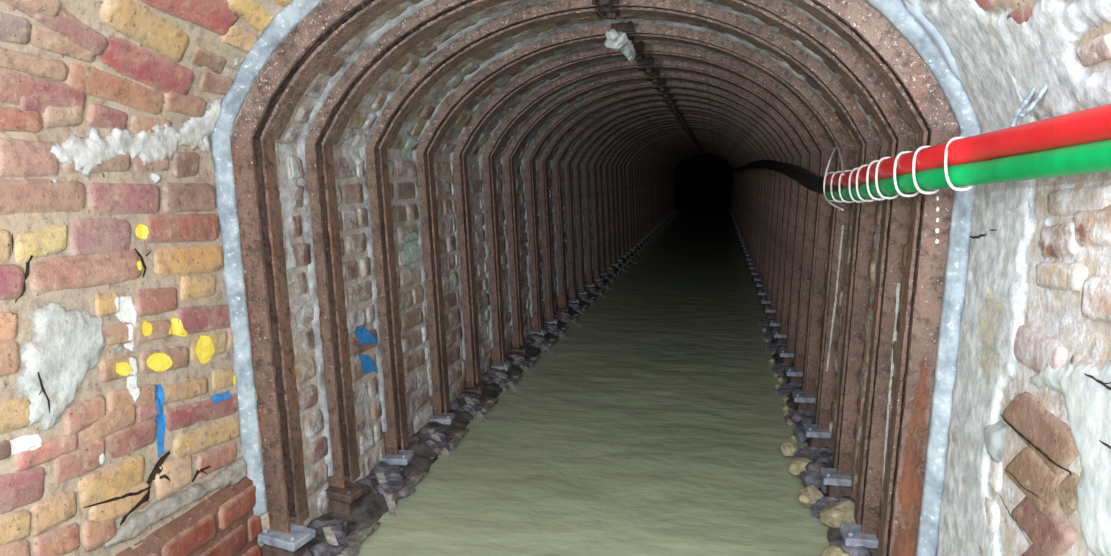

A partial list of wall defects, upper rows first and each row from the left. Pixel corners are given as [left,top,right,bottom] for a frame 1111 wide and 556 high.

crack [12,234,33,303]
crack [135,248,151,278]
crack [37,372,50,413]
crack [1084,373,1111,390]
crack [1001,416,1071,475]
crack [83,451,211,525]
crack [998,472,1042,545]